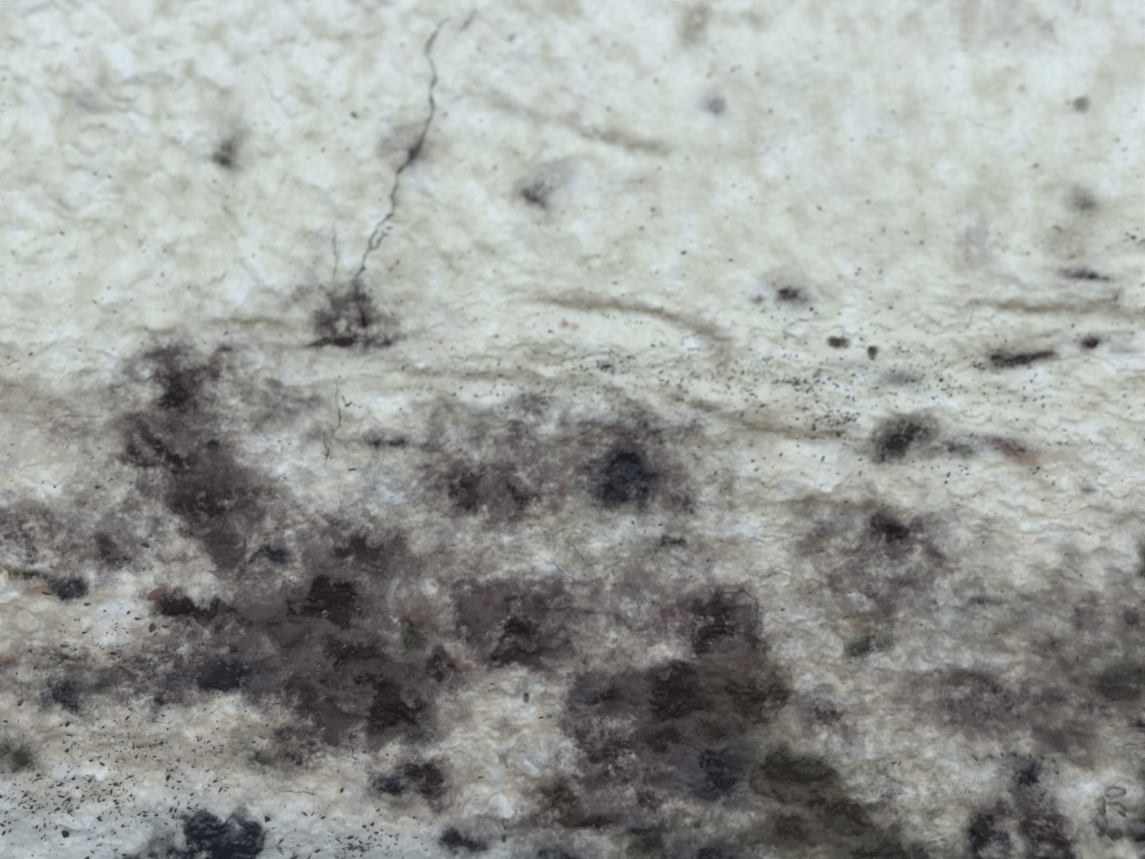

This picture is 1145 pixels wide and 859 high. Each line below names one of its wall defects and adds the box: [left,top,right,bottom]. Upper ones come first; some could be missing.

crack [303,5,477,305]
damp [1003,256,1119,314]
damp [621,304,717,346]
damp [990,342,1057,370]
damp [1081,337,1102,349]
damp [856,415,977,464]
damp [993,438,1033,456]
damp [0,510,135,601]
damp [37,346,936,859]
damp [0,729,35,779]